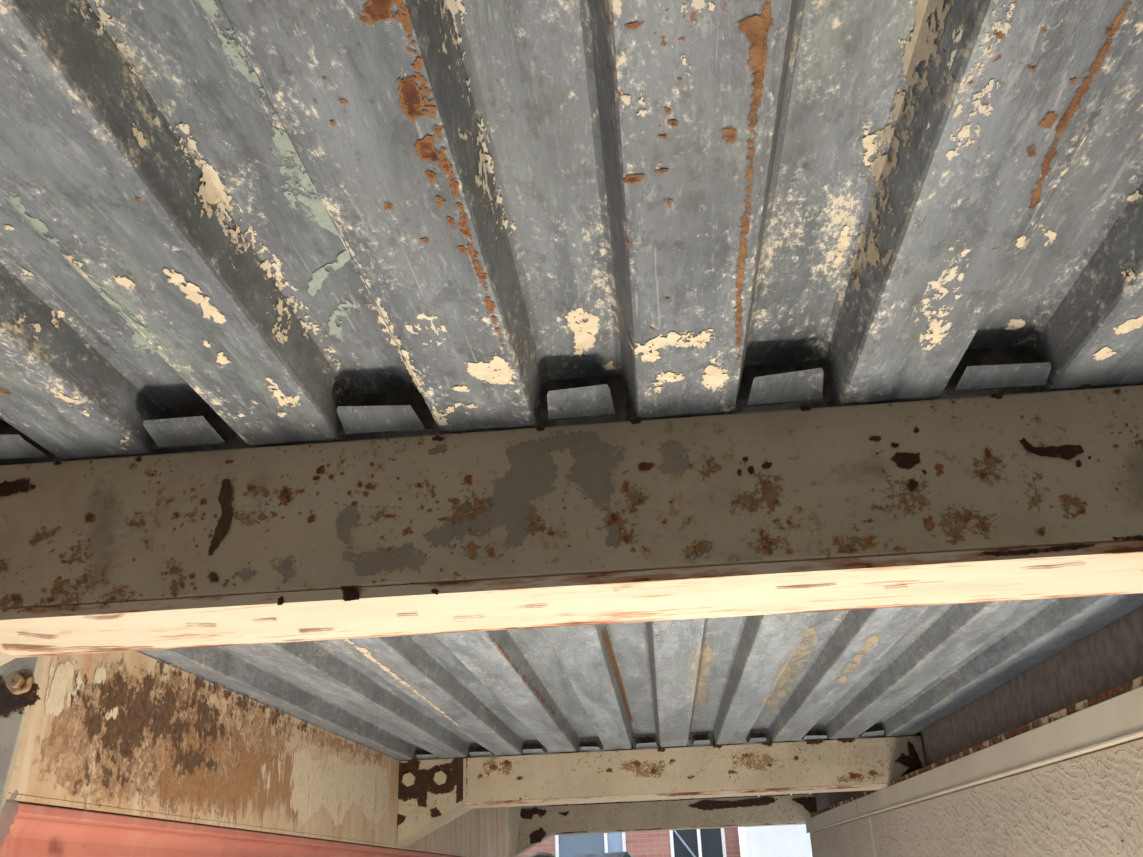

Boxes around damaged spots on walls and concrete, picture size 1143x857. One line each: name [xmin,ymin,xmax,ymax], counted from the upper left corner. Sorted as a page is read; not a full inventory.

peeling [0,184,167,360]
peeling [153,0,516,426]
rust [359,0,506,349]
peeling [563,307,600,356]
peeling [629,329,730,393]
peeling [832,0,963,293]
peeling [906,240,972,351]
rust [818,436,1095,558]
rust [0,675,41,718]
rust [35,658,382,828]
rust [397,756,523,826]
rust [688,796,817,814]